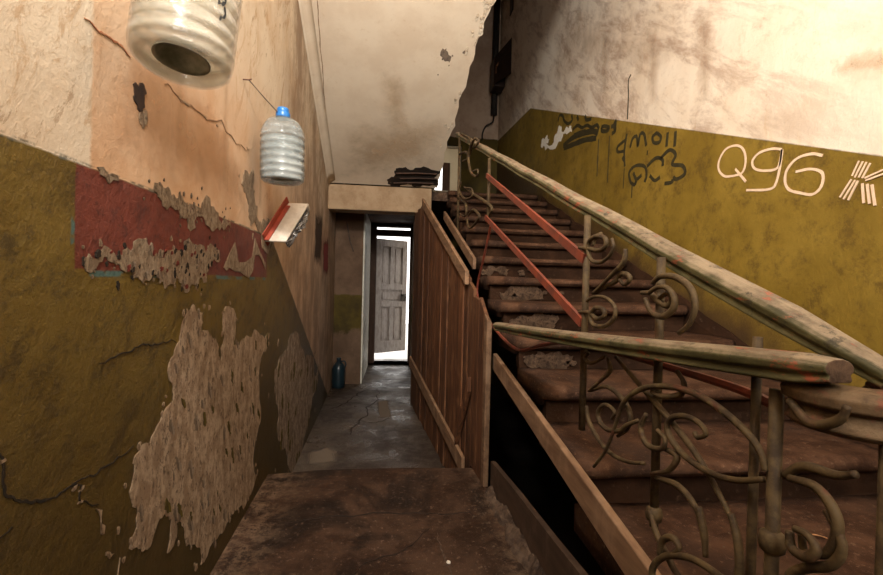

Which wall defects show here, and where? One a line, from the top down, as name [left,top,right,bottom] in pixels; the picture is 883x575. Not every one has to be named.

crack [84,17,131,58]
crack [165,83,249,150]
crack [99,339,176,364]
peeling [81,167,319,575]
crack [0,446,134,507]